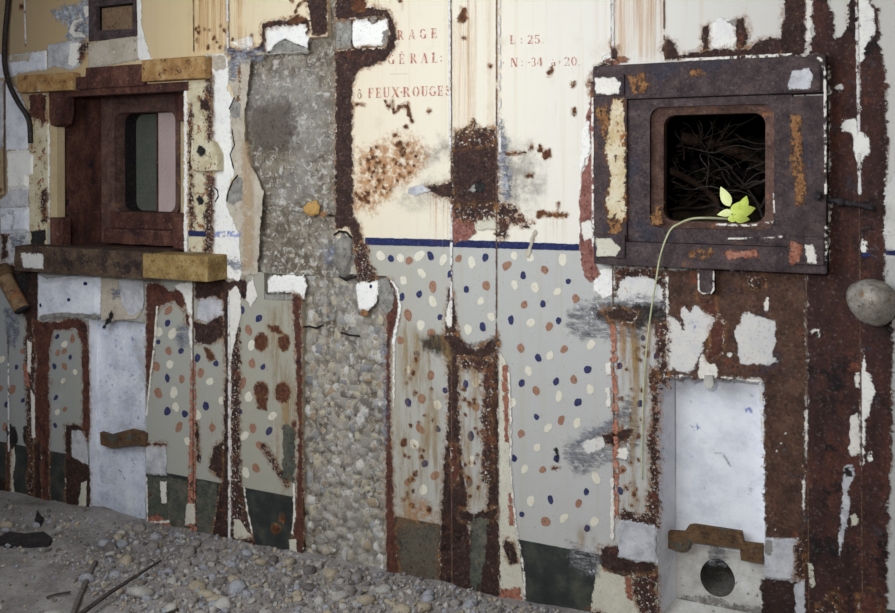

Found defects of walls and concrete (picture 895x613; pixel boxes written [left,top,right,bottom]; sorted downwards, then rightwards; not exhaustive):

corrosion [4,264,91,501]
spalling [206,0,389,569]
corrosion [194,0,568,597]
peeling [587,322,664,613]
corrosion [571,0,895,613]